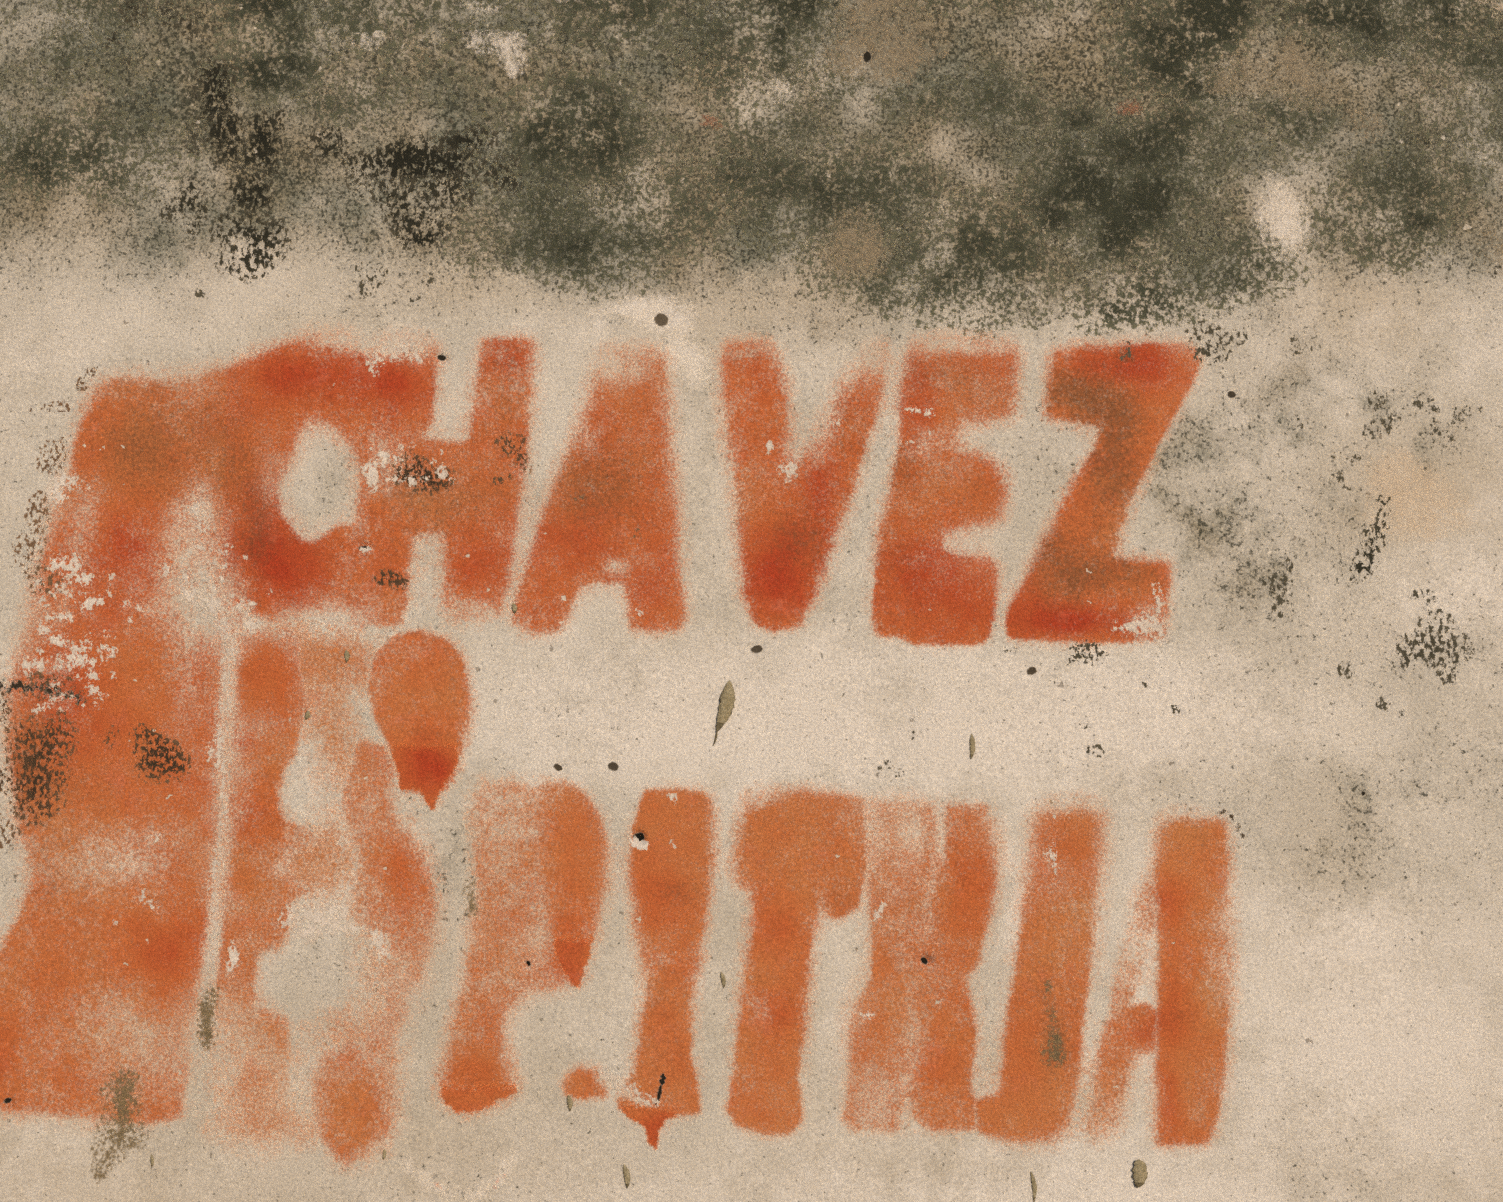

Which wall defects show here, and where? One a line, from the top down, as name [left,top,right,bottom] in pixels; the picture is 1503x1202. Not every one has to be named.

damp [0,0,1503,365]